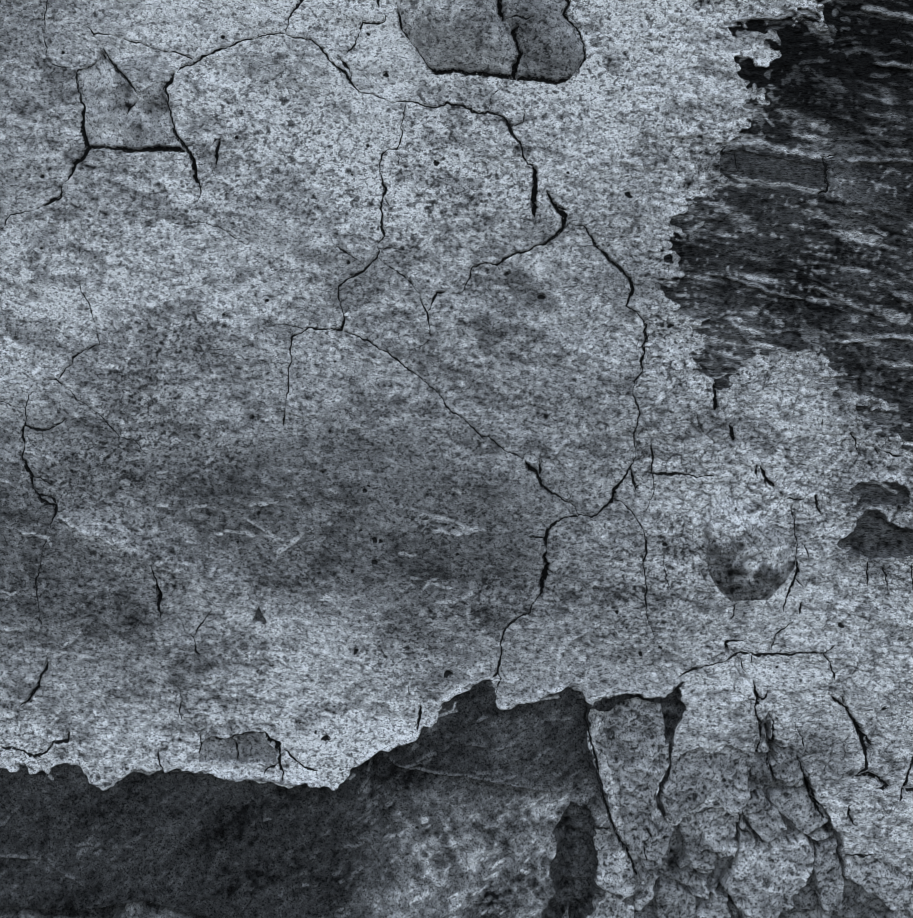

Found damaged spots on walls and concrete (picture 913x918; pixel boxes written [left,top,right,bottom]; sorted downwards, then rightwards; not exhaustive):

flaking render [659,0,913,453]
crack [0,0,713,696]
crack [713,385,736,440]
crack [850,433,901,457]
spalling [837,481,913,560]
crack [679,465,913,818]
crack [20,662,49,706]
crack [2,732,70,769]
crack [175,685,317,780]
crack [408,686,422,730]
flaking render [0,680,913,918]